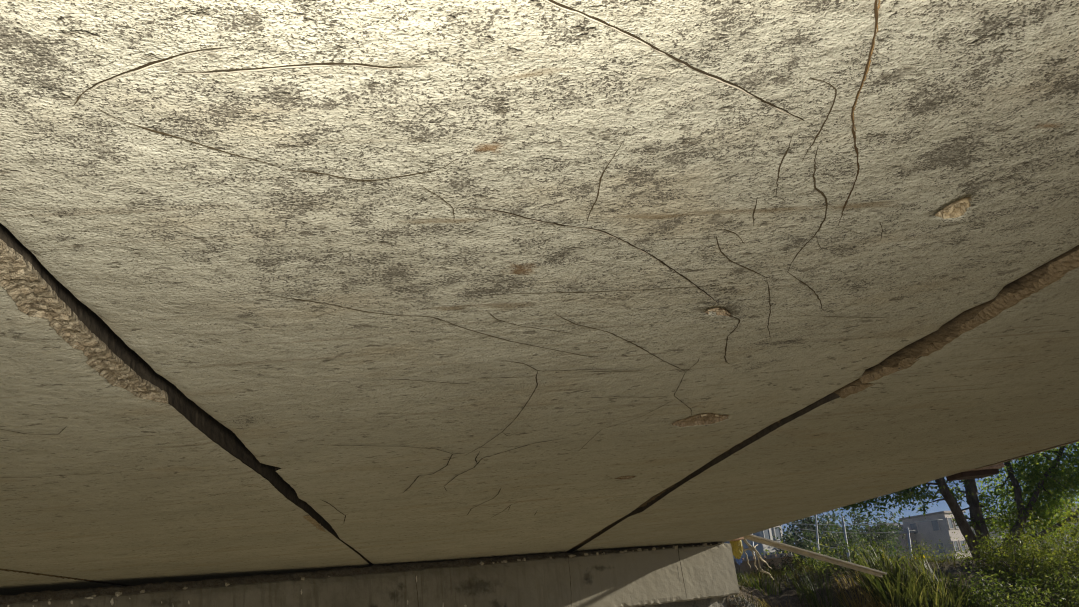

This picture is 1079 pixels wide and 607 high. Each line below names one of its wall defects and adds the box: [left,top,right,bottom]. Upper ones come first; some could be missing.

spalling [0,239,168,405]
crack [74,46,740,493]
crack [546,0,888,335]
spalling [912,186,995,228]